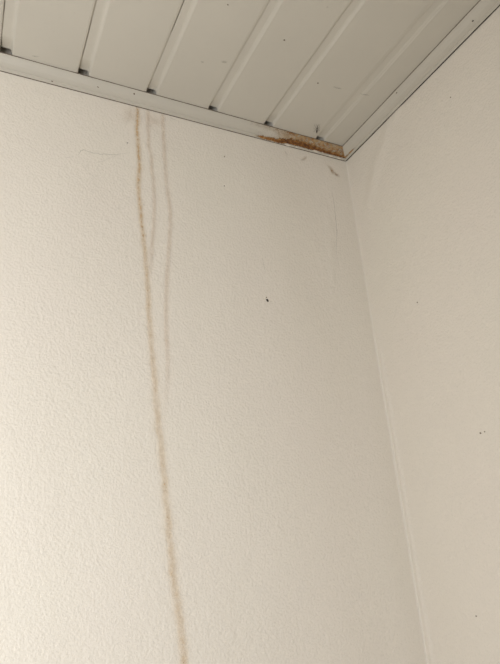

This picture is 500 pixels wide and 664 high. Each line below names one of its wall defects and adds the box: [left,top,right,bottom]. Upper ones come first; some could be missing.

rust [258,131,353,159]